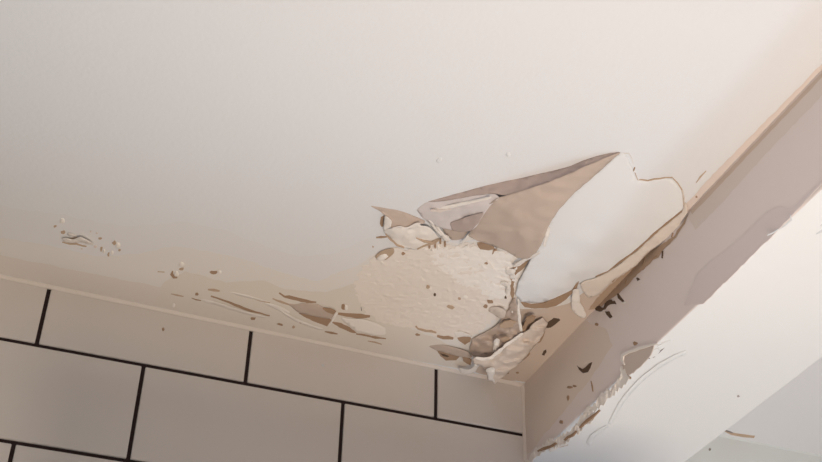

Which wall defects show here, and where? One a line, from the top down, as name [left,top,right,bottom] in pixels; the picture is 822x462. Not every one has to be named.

flaking render [265,152,688,384]